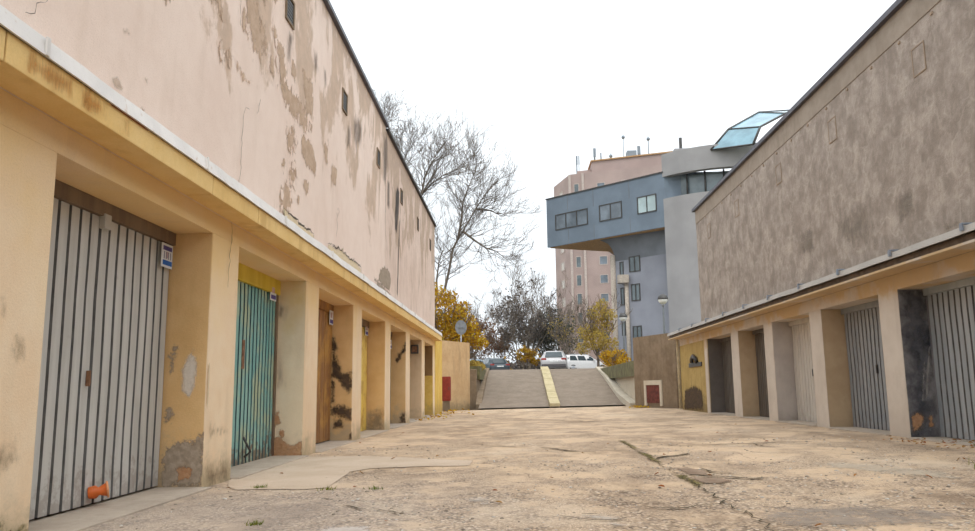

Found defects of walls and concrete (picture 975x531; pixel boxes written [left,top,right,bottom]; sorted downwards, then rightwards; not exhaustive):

peeling [218,39,250,84]
peeling [243,0,337,238]
peeling [169,346,196,396]
flaking render [161,432,204,487]
crack [561,439,774,531]